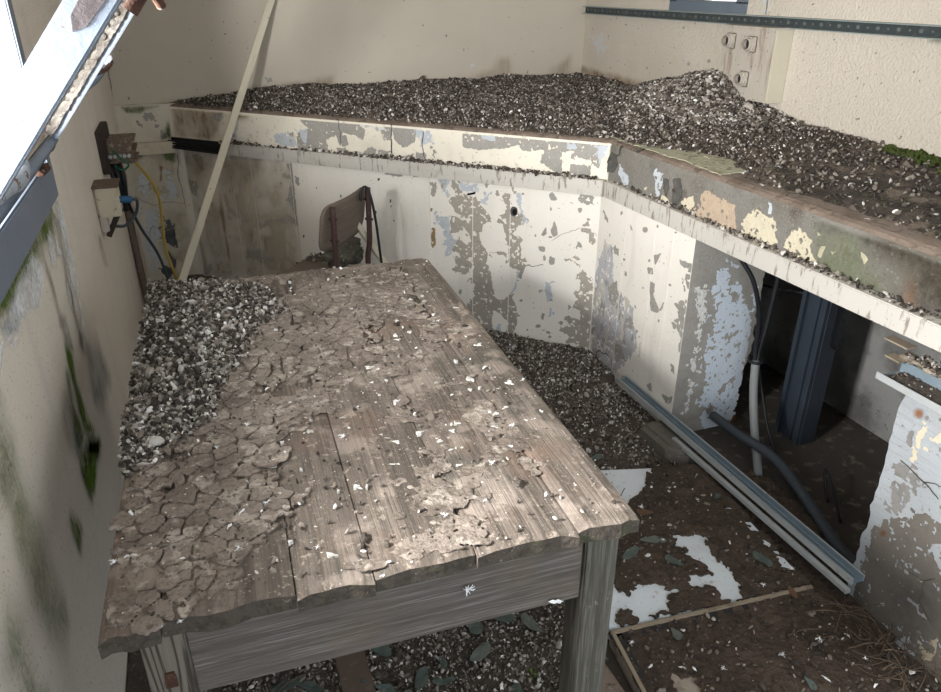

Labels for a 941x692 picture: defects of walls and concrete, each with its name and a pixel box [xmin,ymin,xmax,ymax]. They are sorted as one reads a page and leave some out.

damp [0,202,84,367]
peeling [274,120,437,160]
peeling [430,179,641,378]
peeling [462,133,629,186]
peeling [642,253,759,429]
peeling [644,168,836,262]
peeling [853,416,941,683]
crack [900,460,941,499]